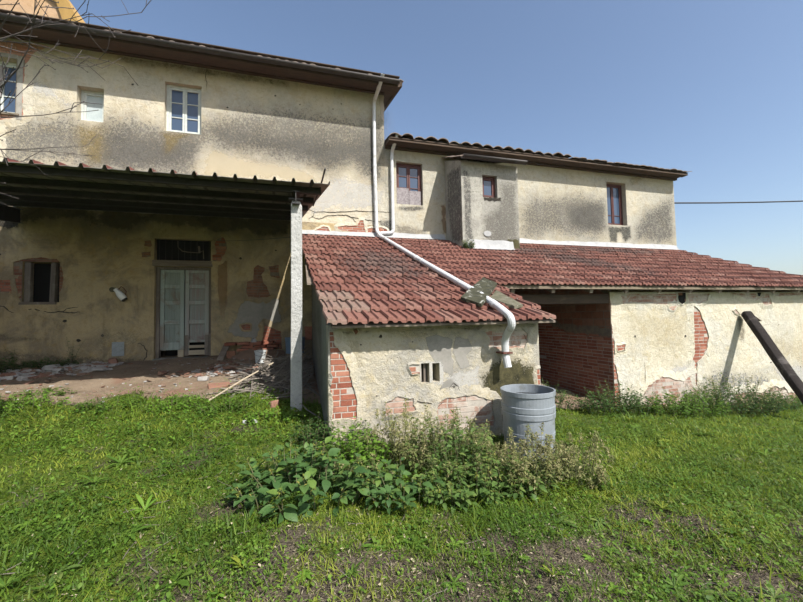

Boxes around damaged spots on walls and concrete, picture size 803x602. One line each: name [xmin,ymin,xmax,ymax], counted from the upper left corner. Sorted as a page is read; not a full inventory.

flaking render [0,37,58,161]
damp [6,83,388,213]
crack [310,210,384,222]
flaking render [314,217,389,237]
damp [447,167,473,241]
damp [481,183,674,250]
flaking render [3,250,74,312]
flaking render [228,257,287,351]
flaking render [328,327,367,430]
flaking render [376,335,503,439]
flaking render [478,289,713,406]
flaking render [731,293,803,316]